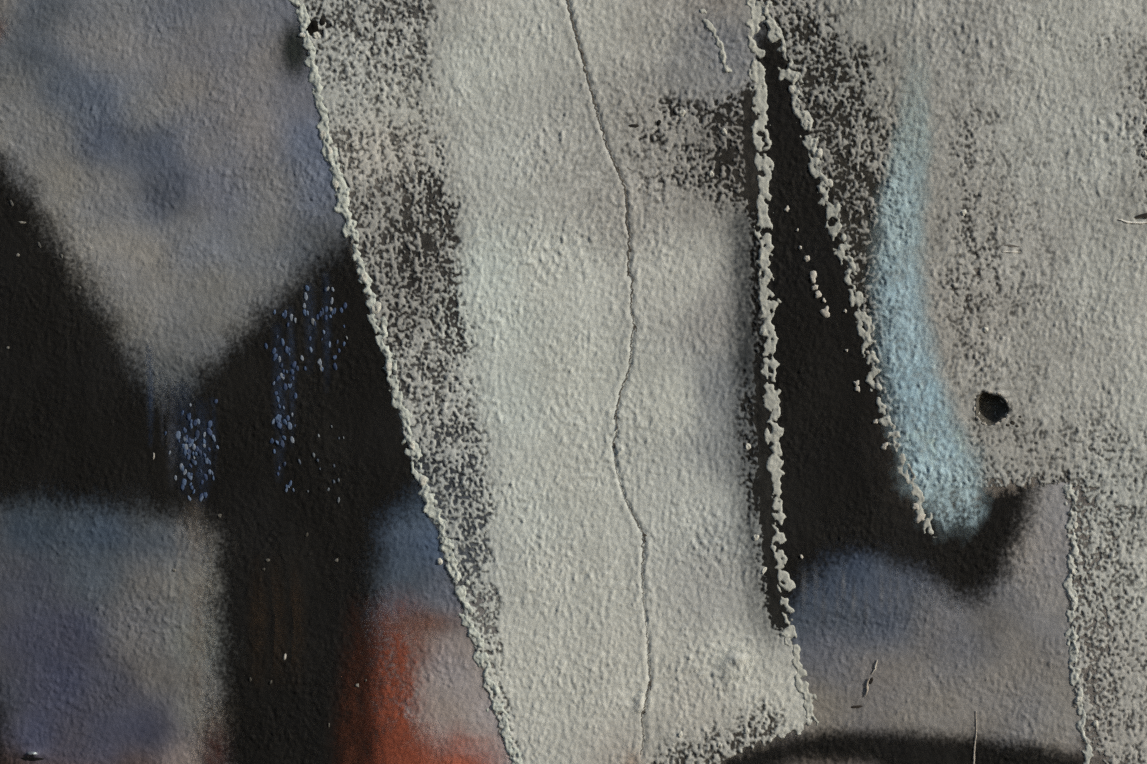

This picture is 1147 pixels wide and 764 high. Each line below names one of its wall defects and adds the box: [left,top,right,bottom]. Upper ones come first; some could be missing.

peeling [298,0,431,86]
peeling [758,0,900,309]
spalling [165,403,219,502]
spalling [264,285,348,503]
peeling [319,130,502,671]
crack [566,0,652,755]
peeling [739,342,789,631]
hole [973,391,1022,427]
peeling [952,470,1044,500]
peeling [851,660,878,708]